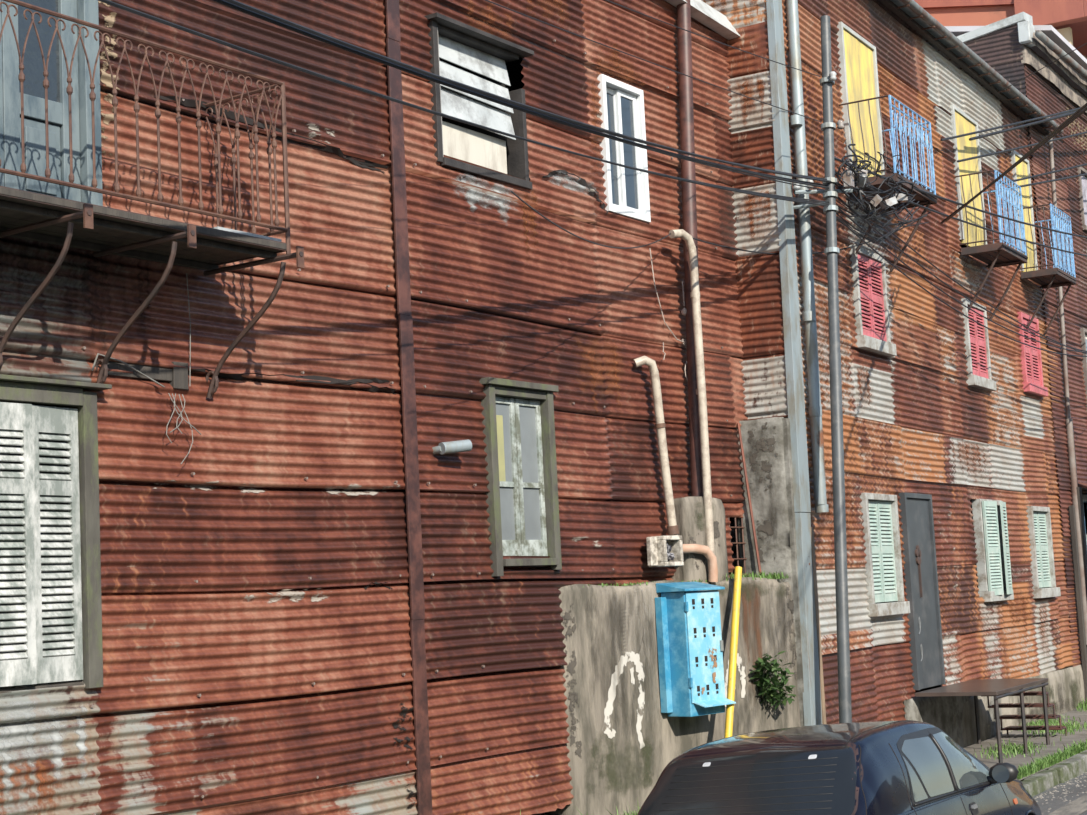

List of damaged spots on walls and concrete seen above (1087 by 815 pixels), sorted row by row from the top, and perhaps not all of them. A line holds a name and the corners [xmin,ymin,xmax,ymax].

damp [612,591,651,685]
rust [1010,596,1048,637]
rust [392,695,414,752]
rust [0,758,53,814]